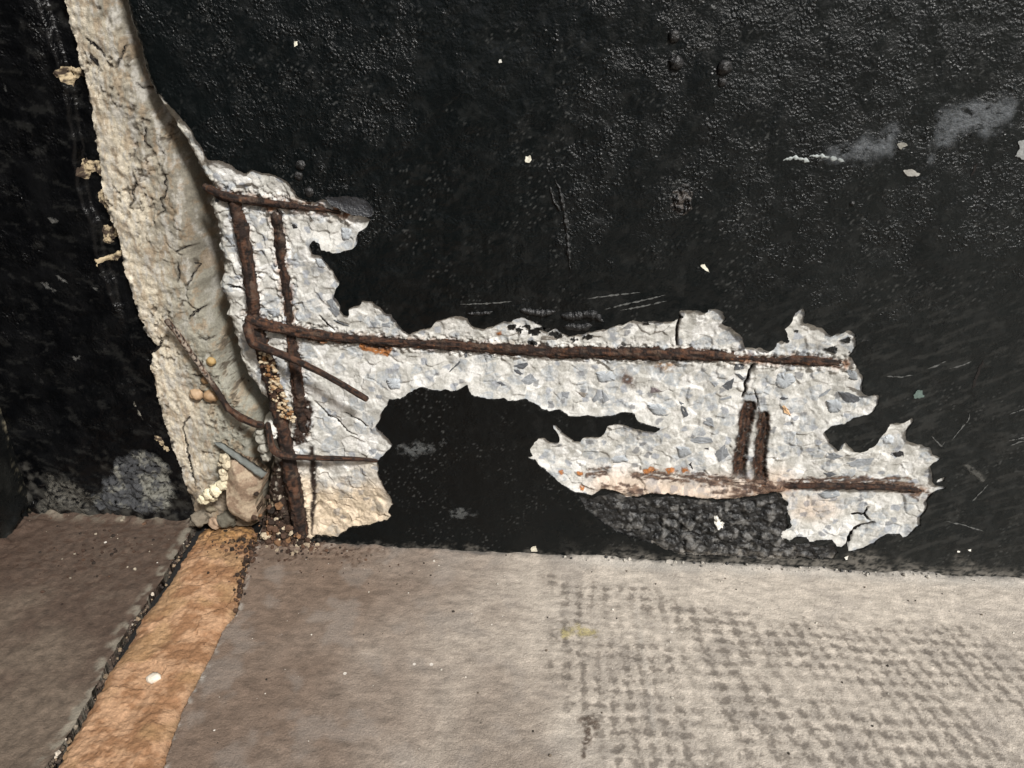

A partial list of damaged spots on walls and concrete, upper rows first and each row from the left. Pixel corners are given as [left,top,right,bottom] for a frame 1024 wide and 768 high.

crack [88,40,126,66]
crack [176,244,202,282]
rust [359,343,392,357]
spalling [159,94,945,560]
rust [258,352,317,535]
rust [577,401,920,501]